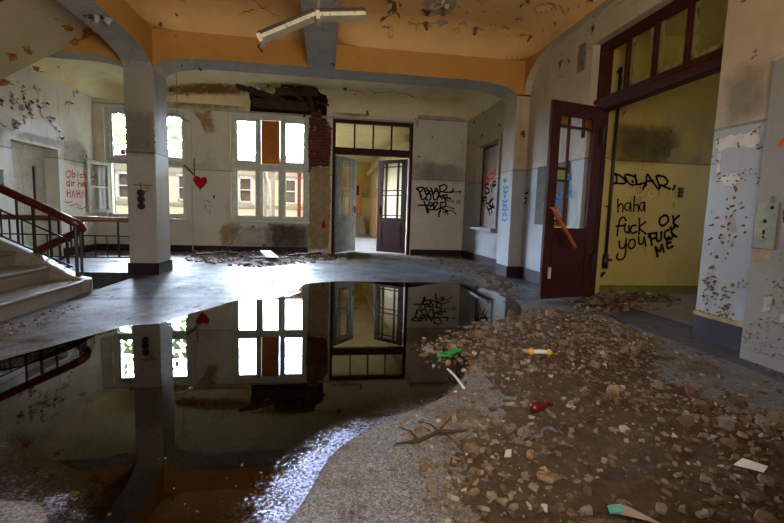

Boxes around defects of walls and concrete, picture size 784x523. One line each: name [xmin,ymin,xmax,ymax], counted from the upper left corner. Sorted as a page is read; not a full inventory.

peeling [380,0,402,38]
peeling [408,0,510,35]
peeling [307,117,332,249]
peeling [699,123,763,325]
peeling [739,279,784,359]